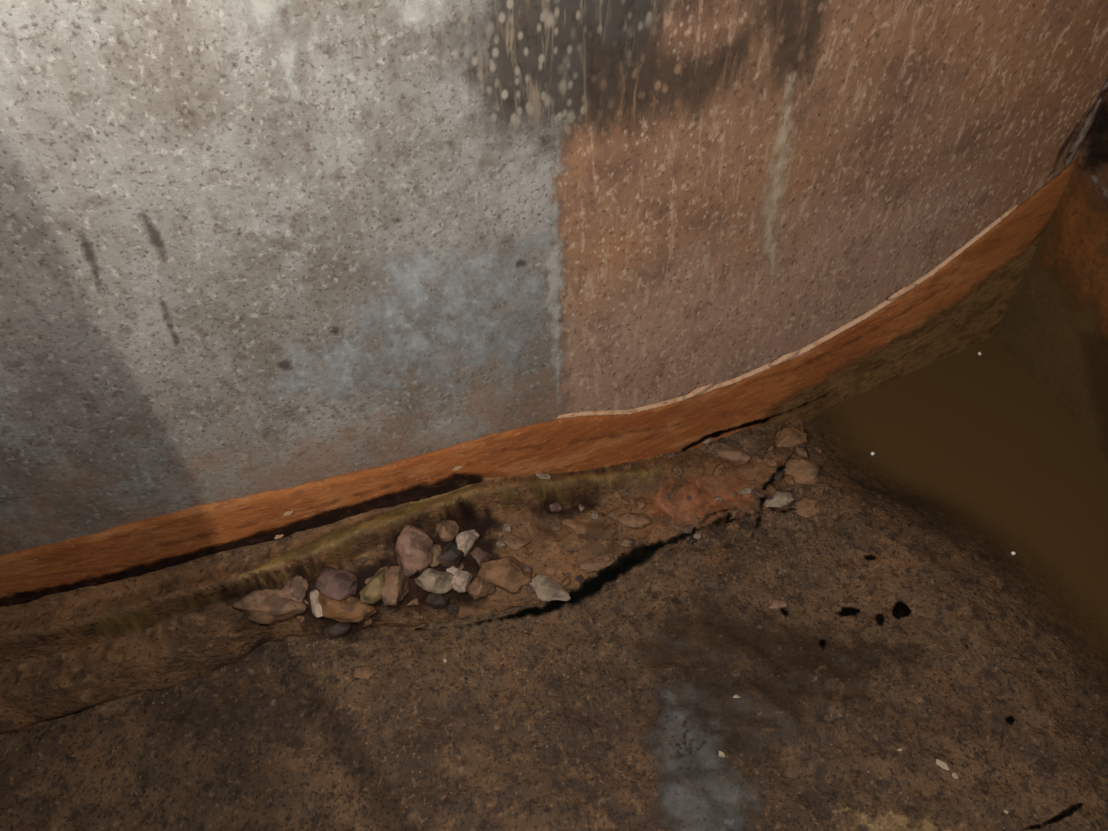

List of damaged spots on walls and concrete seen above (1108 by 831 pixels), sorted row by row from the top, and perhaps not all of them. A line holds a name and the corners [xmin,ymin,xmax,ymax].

leakage [469,0,746,130]
leakage [762,0,825,284]
leakage [1085,103,1108,194]
rust [0,0,1108,598]
crack [415,465,796,630]
leakage [646,605,881,831]